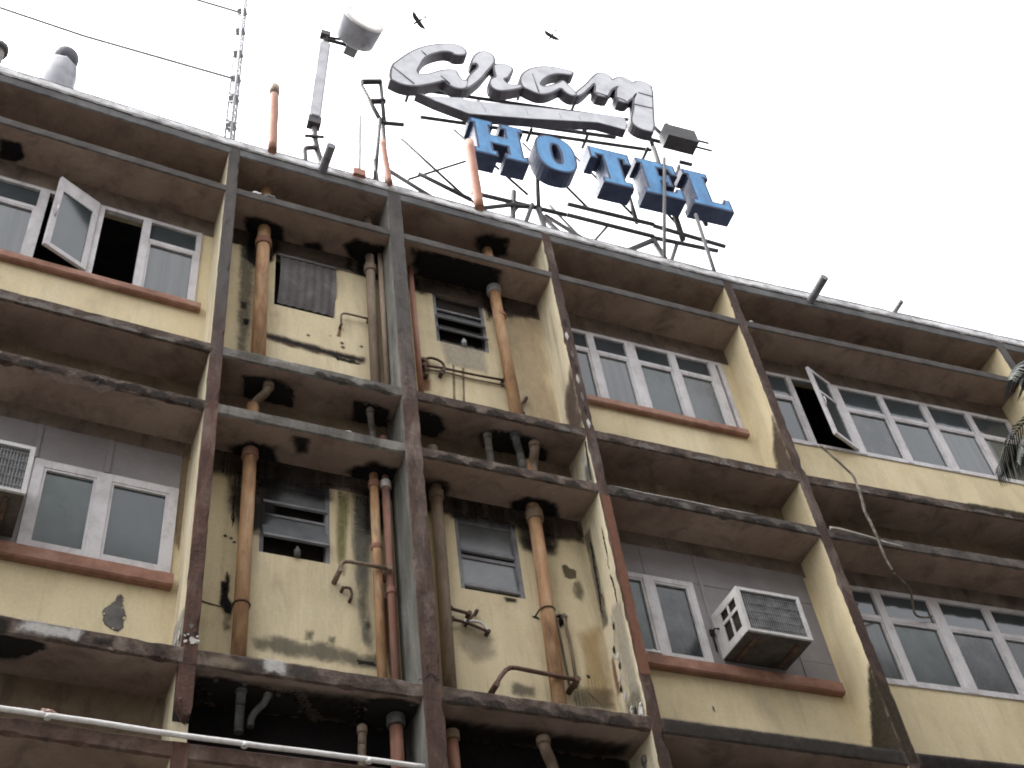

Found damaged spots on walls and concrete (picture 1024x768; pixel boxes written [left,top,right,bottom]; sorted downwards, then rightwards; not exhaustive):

damp [238,248,260,361]
damp [338,491,372,643]
peeling [92,595,126,651]
damp [202,572,232,629]
damp [239,632,377,678]